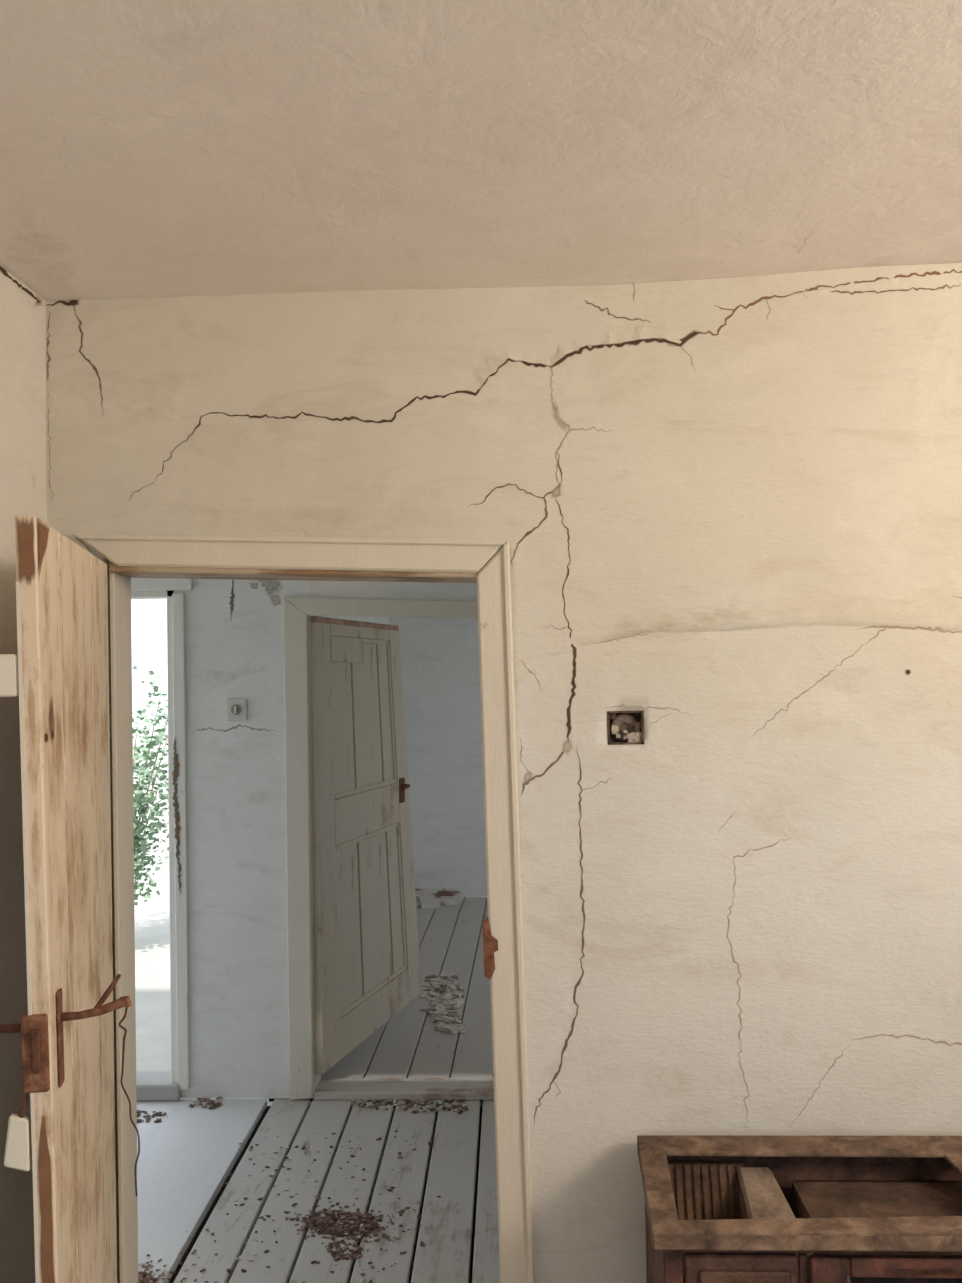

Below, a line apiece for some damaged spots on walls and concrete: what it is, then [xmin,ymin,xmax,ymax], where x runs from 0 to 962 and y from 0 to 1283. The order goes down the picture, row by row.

crack [0,266,103,503]
crack [130,269,962,1127]